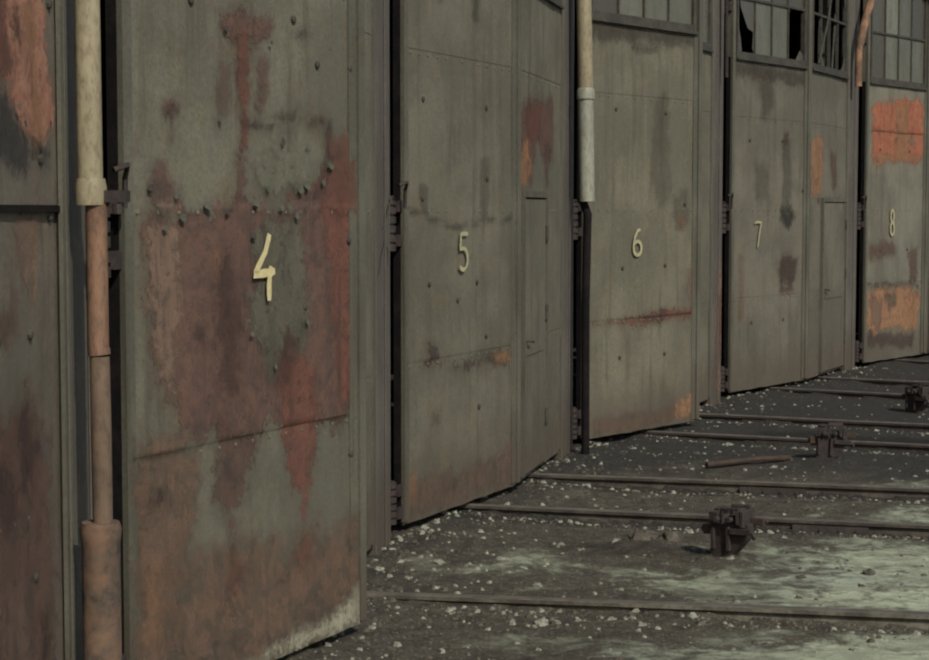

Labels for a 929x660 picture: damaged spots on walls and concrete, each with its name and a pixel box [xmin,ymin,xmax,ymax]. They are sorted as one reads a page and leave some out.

rust [521,93,553,185]
rust [134,5,350,567]
rust [617,307,691,327]
rust [866,252,921,336]